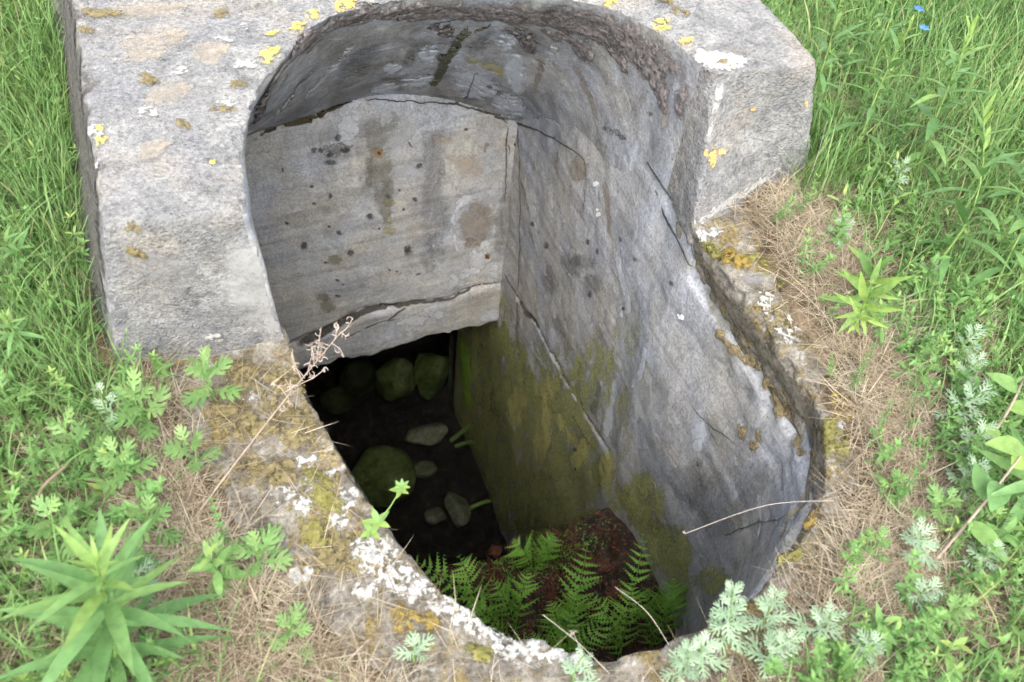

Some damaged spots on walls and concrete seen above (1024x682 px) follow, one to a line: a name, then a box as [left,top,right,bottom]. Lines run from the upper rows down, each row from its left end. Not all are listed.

crack [655,190,691,266]
crack [299,128,604,448]
damp [589,380,617,439]
crack [725,514,787,536]